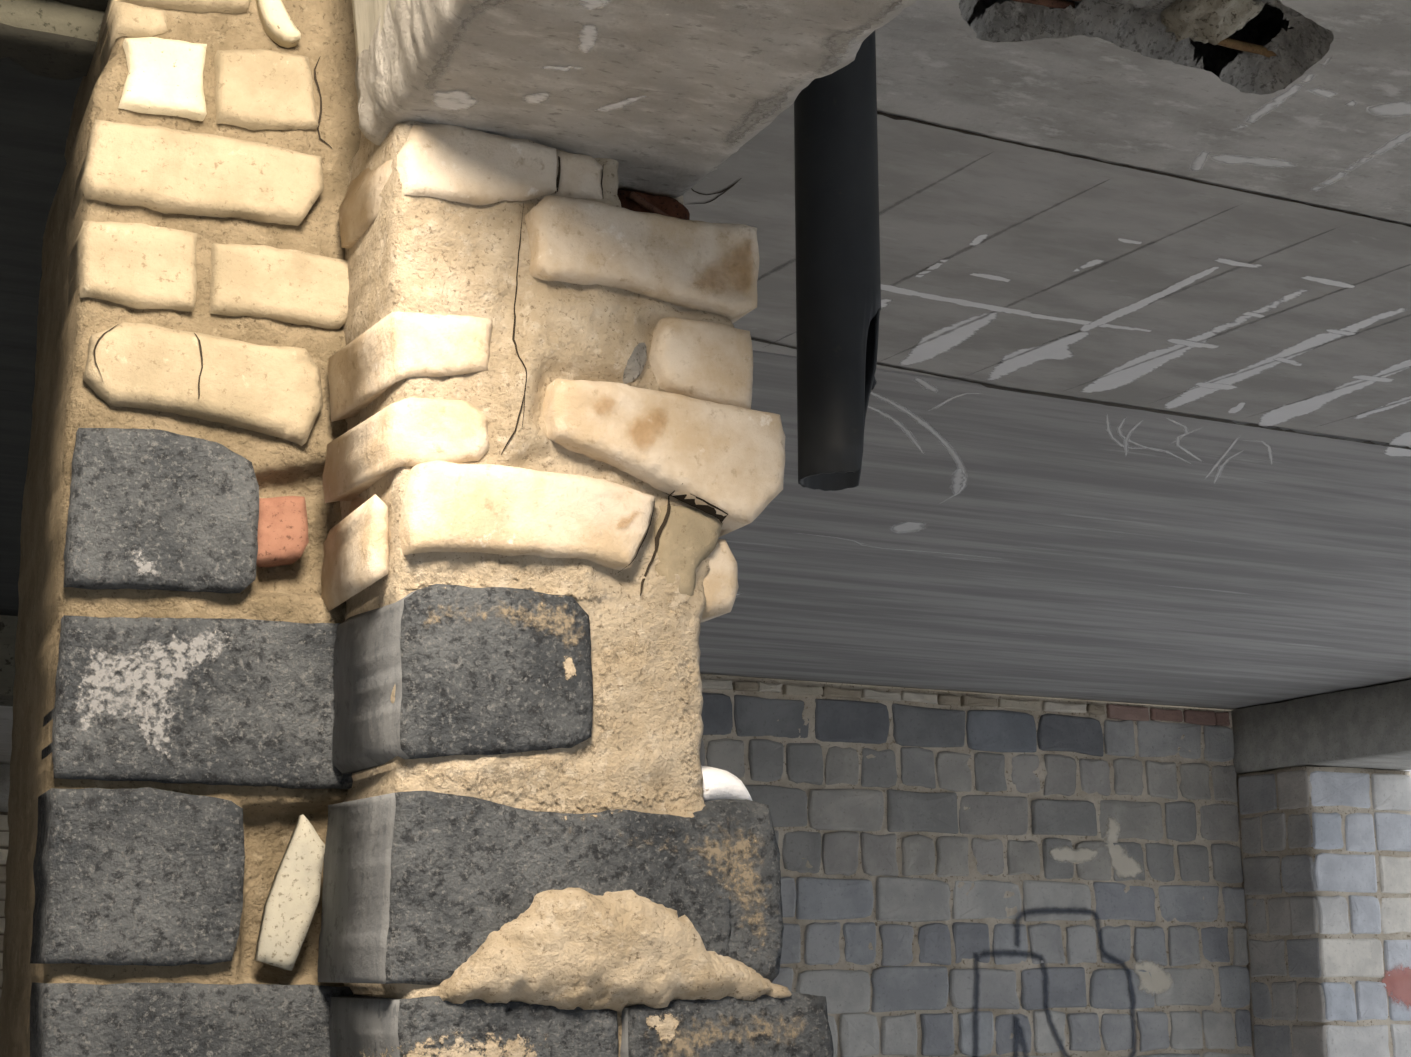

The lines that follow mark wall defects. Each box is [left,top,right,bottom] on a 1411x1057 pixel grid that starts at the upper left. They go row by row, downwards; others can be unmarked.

spalling [959,0,1334,95]
corrosion [617,188,690,220]
crack [501,156,561,455]
crack [618,483,728,596]